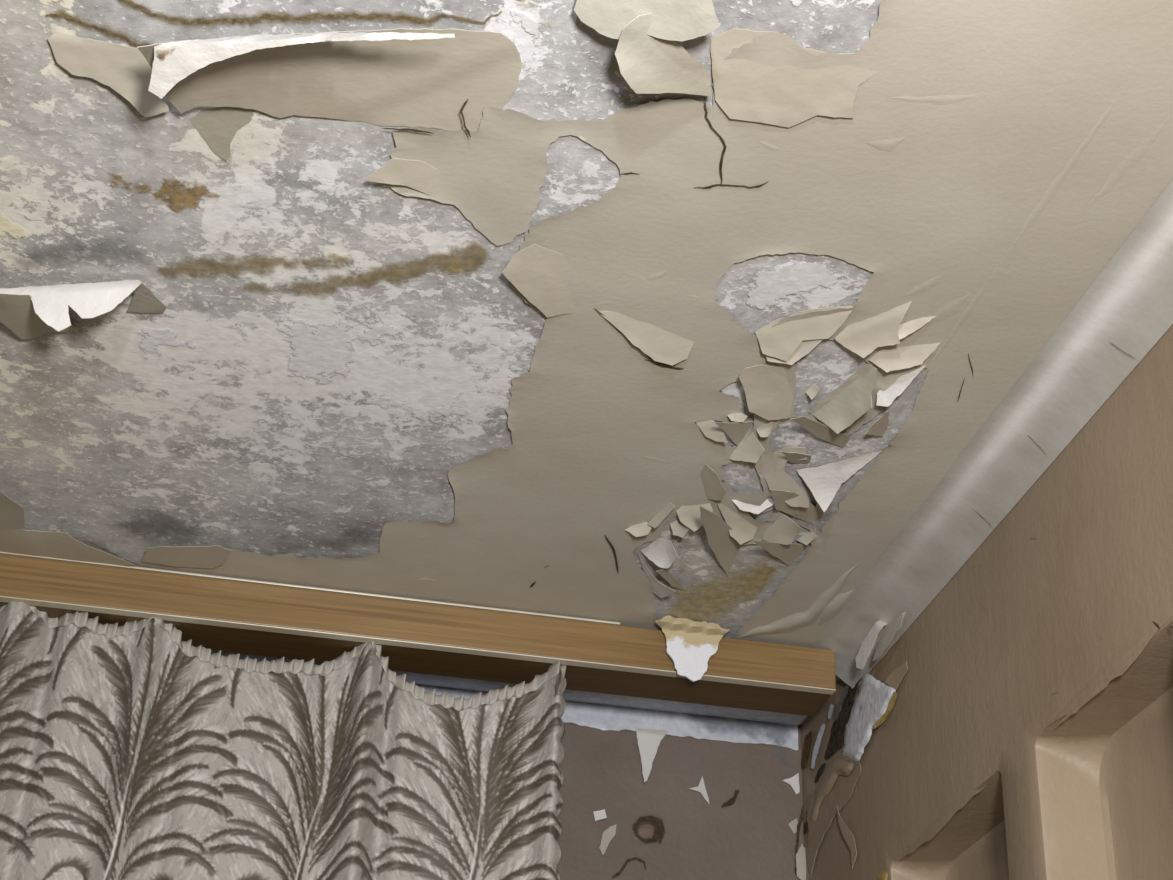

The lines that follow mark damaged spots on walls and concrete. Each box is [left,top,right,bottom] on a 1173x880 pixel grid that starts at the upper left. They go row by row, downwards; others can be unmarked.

crack [45,0,502,47]
crack [694,97,767,189]
water stain [159,242,487,295]
peeling [0,0,882,564]
peeling [625,252,940,638]
flaking render [782,661,908,874]